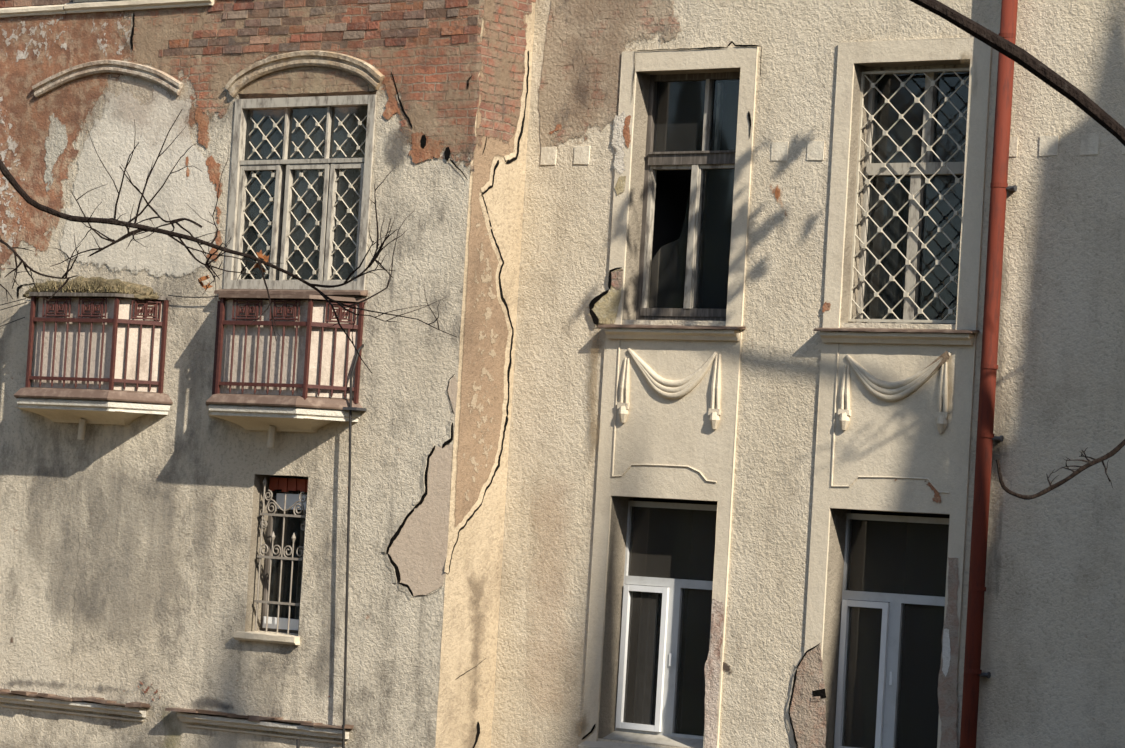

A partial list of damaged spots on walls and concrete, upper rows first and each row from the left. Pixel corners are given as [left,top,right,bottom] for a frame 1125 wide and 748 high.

flaking render [538,0,681,195]
flaking render [0,0,532,596]
crack [379,50,529,600]
spalling [592,269,623,324]
crack [472,722,480,748]
spalling [790,643,827,748]
spalling [938,557,959,748]